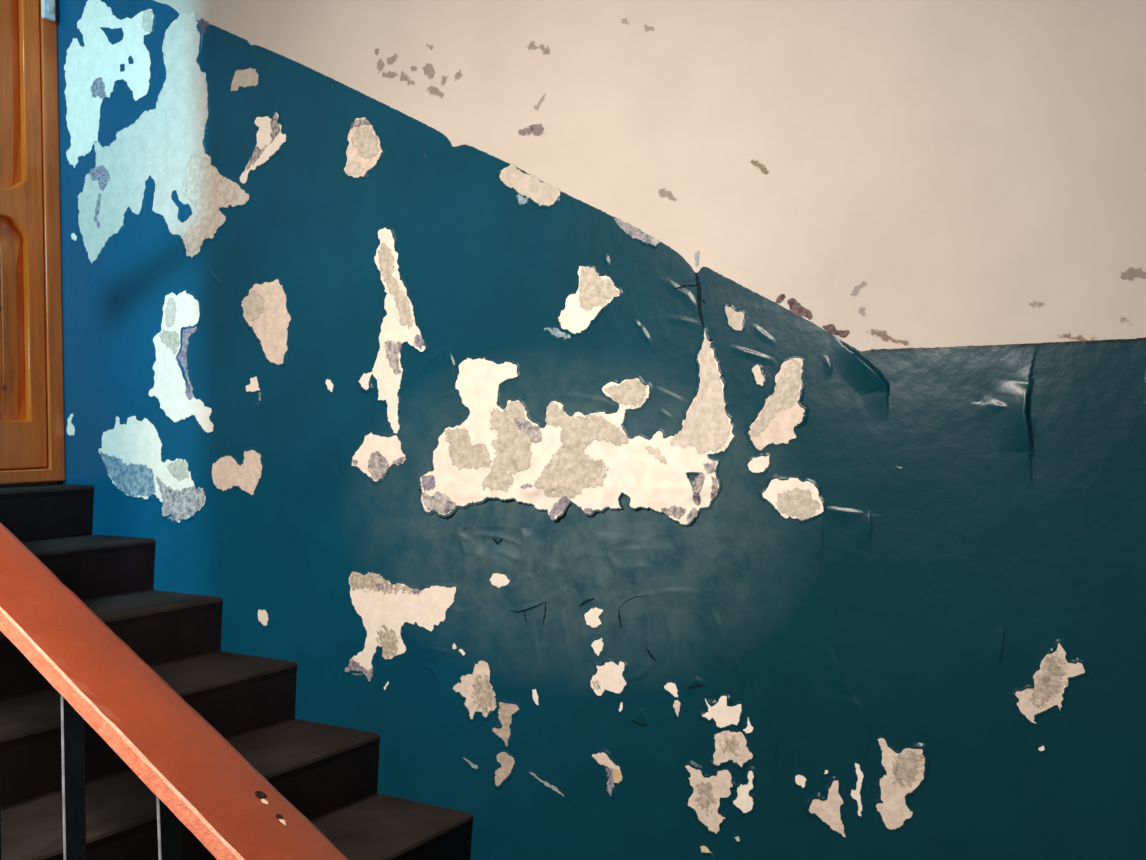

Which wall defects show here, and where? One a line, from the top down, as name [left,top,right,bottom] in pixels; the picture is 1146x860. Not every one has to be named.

peeling [63,0,288,264]
peeling [98,288,264,525]
peeling [241,278,292,368]
peeling [351,225,428,486]
peeling [544,264,623,339]
peeling [417,326,827,526]
crack [674,273,707,328]
peeling [343,570,459,691]
peeling [1011,639,1090,726]
peeling [683,693,758,859]
peeling [792,735,931,839]